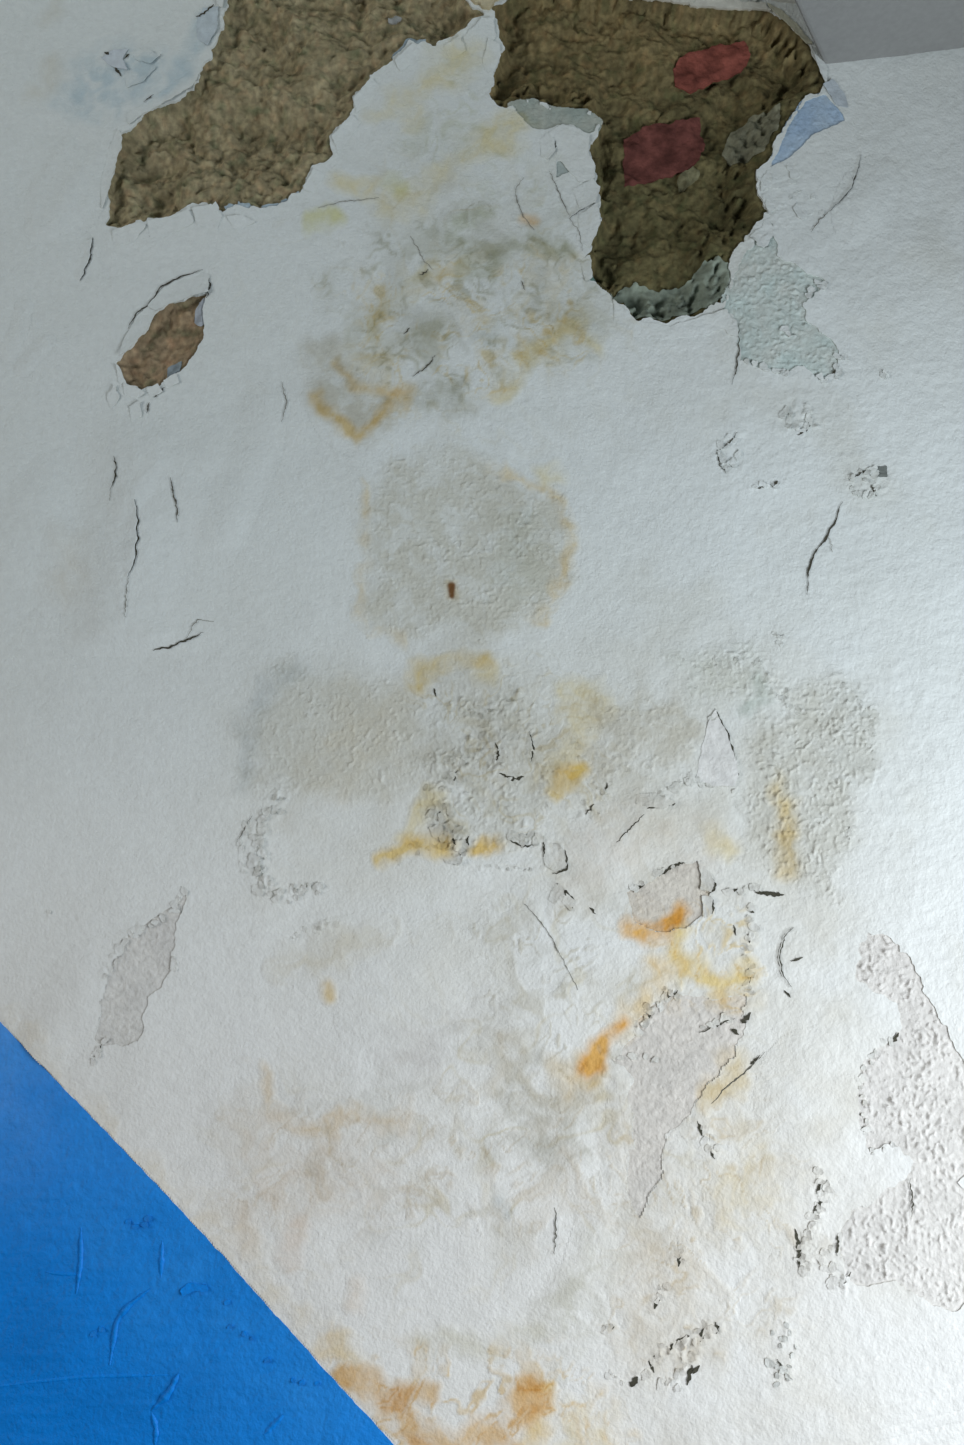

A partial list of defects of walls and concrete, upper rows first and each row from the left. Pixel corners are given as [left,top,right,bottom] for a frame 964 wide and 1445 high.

leakage [298,199,356,258]
leakage [307,25,624,399]
flaking render [101,0,849,384]
flaking render [107,270,211,422]
crack [170,477,179,518]
crack [807,502,843,591]
crack [153,619,214,651]
rust [370,783,503,873]
leakage [0,364,887,1445]
rust [542,894,781,1094]
peeling [793,933,964,1311]
rust [318,1325,645,1445]